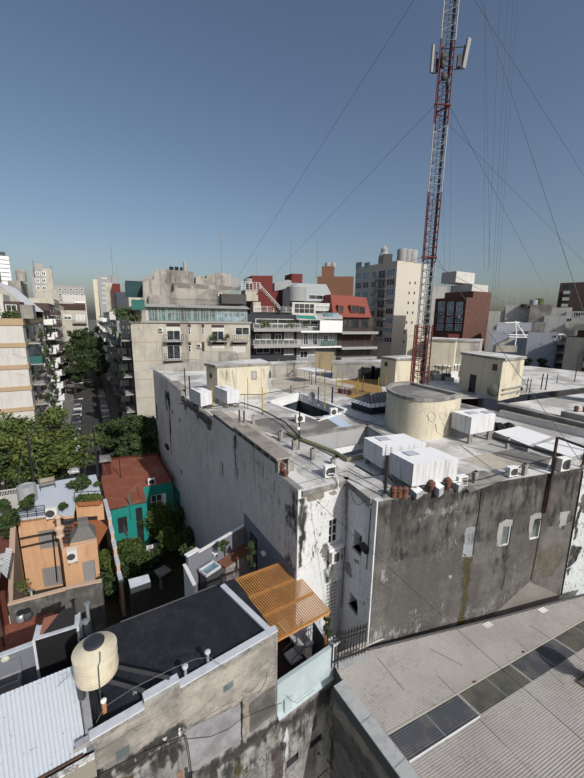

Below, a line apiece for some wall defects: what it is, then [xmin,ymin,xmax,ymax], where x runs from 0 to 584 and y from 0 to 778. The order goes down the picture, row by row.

damp [156,391,171,447]
damp [278,492,328,568]
peeling [306,491,337,504]
spalling [567,494,584,575]
damp [100,724,185,778]
damp [193,685,377,778]
peeling [333,704,388,778]